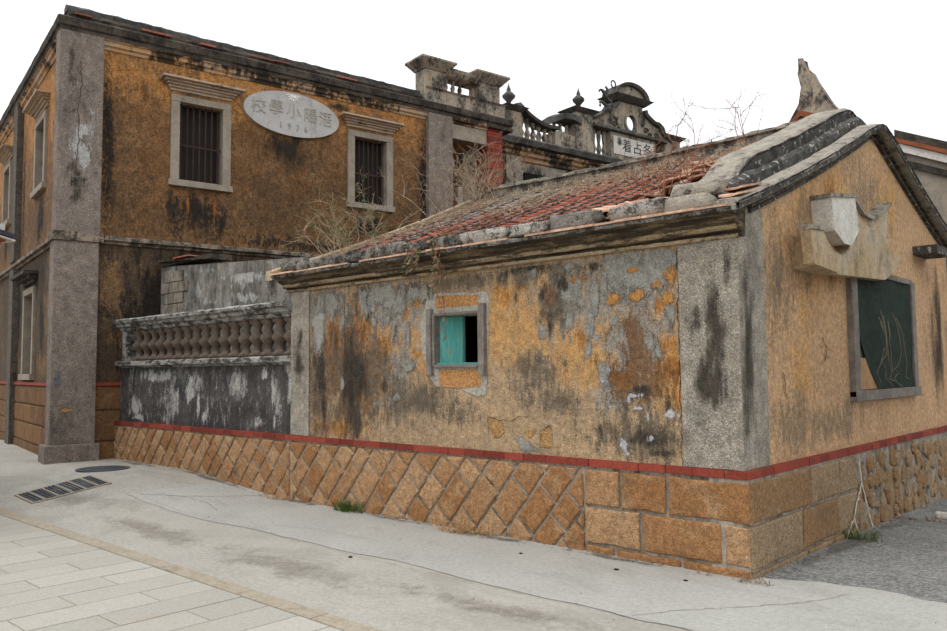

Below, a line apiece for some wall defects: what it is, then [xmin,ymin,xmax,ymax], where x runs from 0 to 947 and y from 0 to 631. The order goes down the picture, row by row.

crack [67,60,94,160]
peeling [68,105,99,173]
water stain [67,106,112,204]
water stain [342,327,369,438]
peeling [310,281,434,360]
peeling [560,249,677,391]
water stain [686,249,730,409]
water stain [742,260,754,433]
spalling [488,418,553,454]